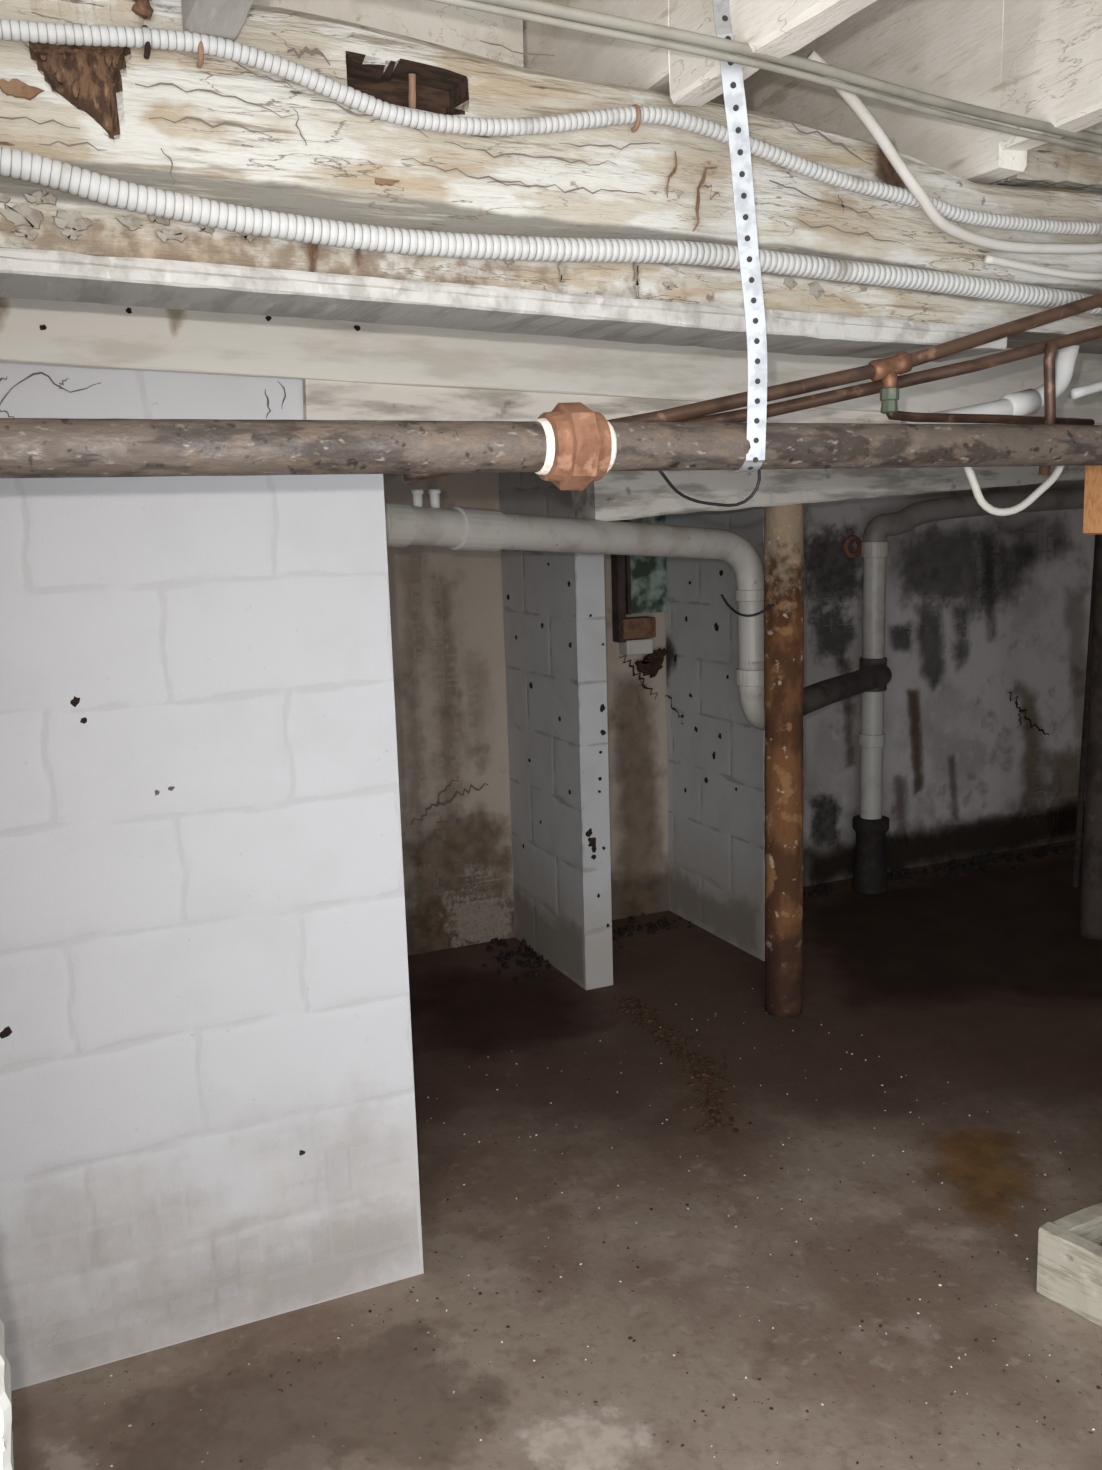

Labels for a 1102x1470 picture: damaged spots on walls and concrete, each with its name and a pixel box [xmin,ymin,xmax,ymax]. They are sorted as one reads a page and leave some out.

peeling [0,71,63,100]
crack [0,116,102,151]
crack [135,46,372,186]
crack [480,40,554,56]
crack [401,126,720,231]
damp [804,527,863,666]
damp [891,528,1032,686]
damp [412,813,512,954]
damp [811,795,856,882]